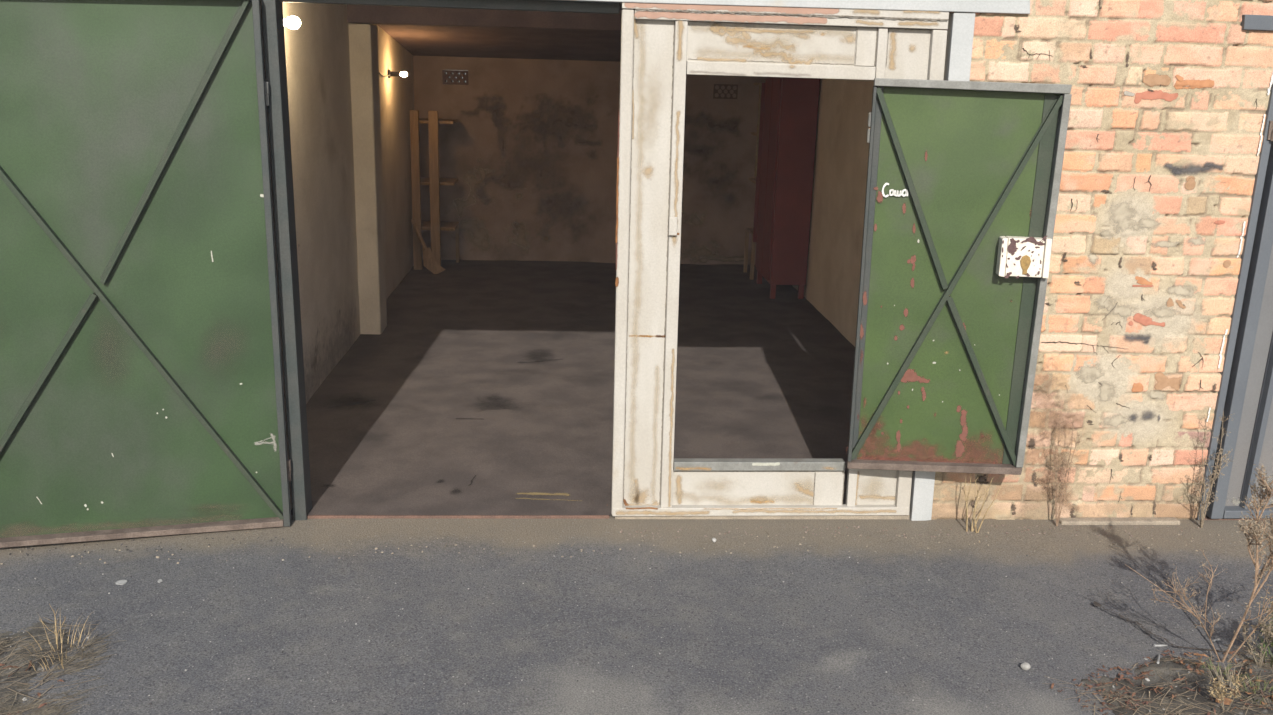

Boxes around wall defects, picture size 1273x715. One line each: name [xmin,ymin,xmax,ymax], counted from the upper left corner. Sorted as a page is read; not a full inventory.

peeling [881,369,930,452]
peeling [955,405,983,458]